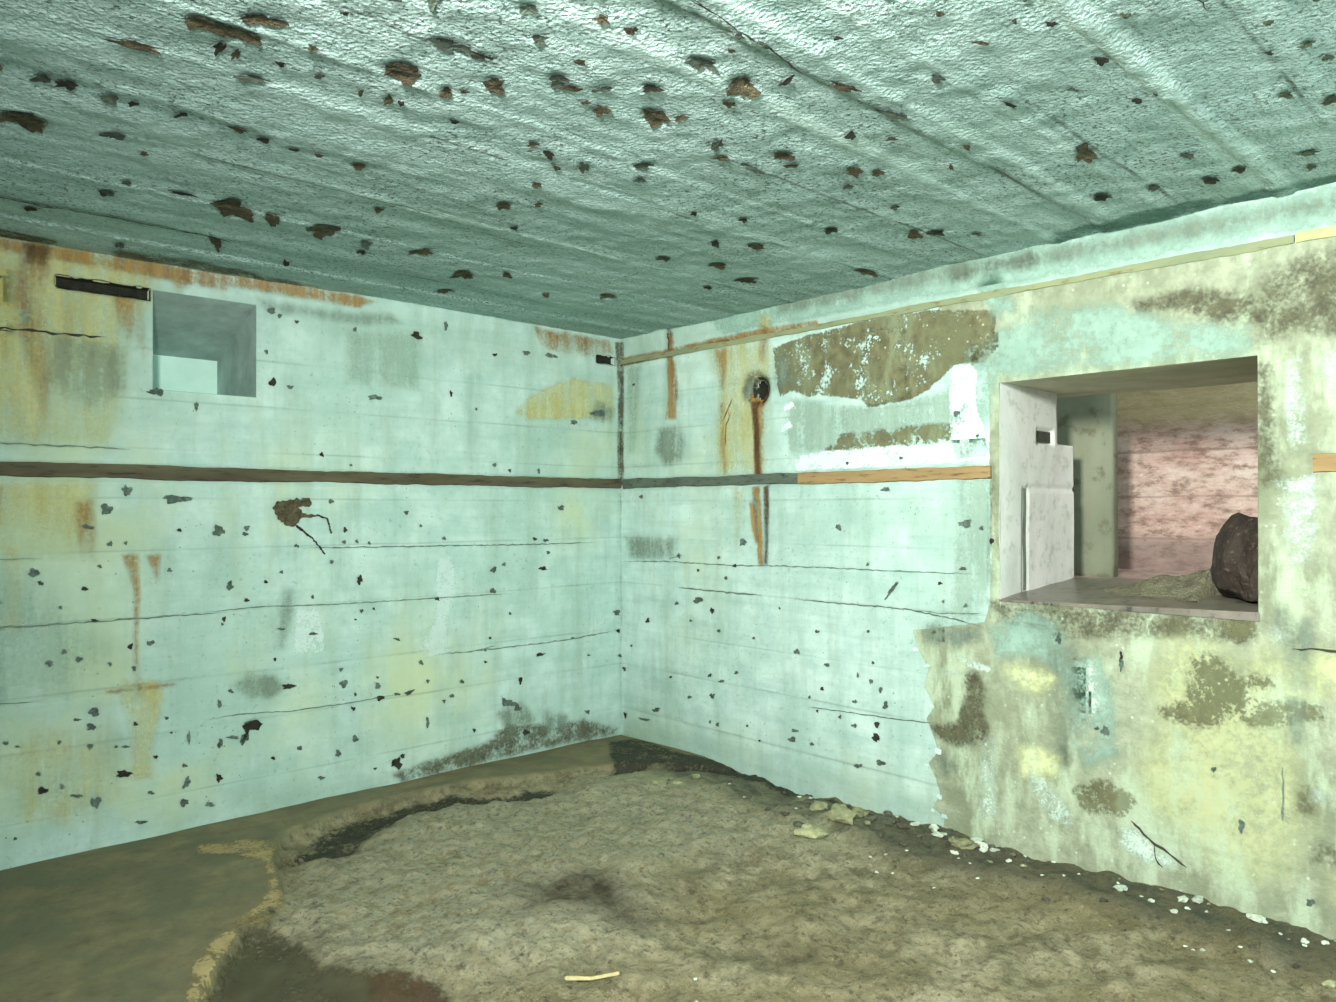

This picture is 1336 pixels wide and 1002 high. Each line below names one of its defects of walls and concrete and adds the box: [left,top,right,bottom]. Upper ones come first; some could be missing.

corrosion [0,240,366,434]
water stain [520,343,638,485]
corrosion [603,321,818,564]
water stain [715,176,1336,450]
water stain [1258,360,1317,562]
corrosion [124,556,159,624]
peeling [773,237,1336,940]
water stain [395,709,614,780]